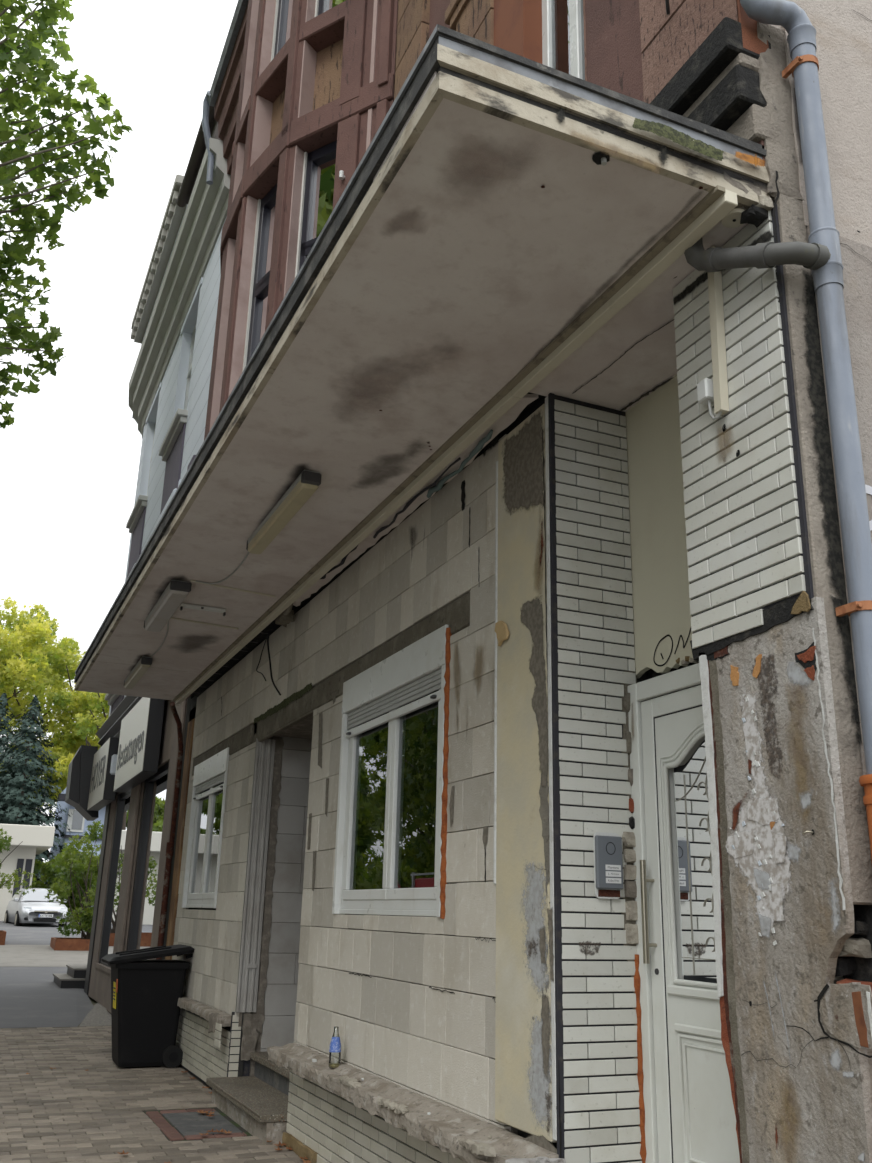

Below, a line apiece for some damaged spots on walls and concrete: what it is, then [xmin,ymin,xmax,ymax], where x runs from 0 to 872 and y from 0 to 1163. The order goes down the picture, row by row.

water stain [557,107,767,186]
spalling [791,591,811,614]
peeling [521,597,554,1132]
flaking render [795,627,872,1049]
crack [741,984,872,1069]